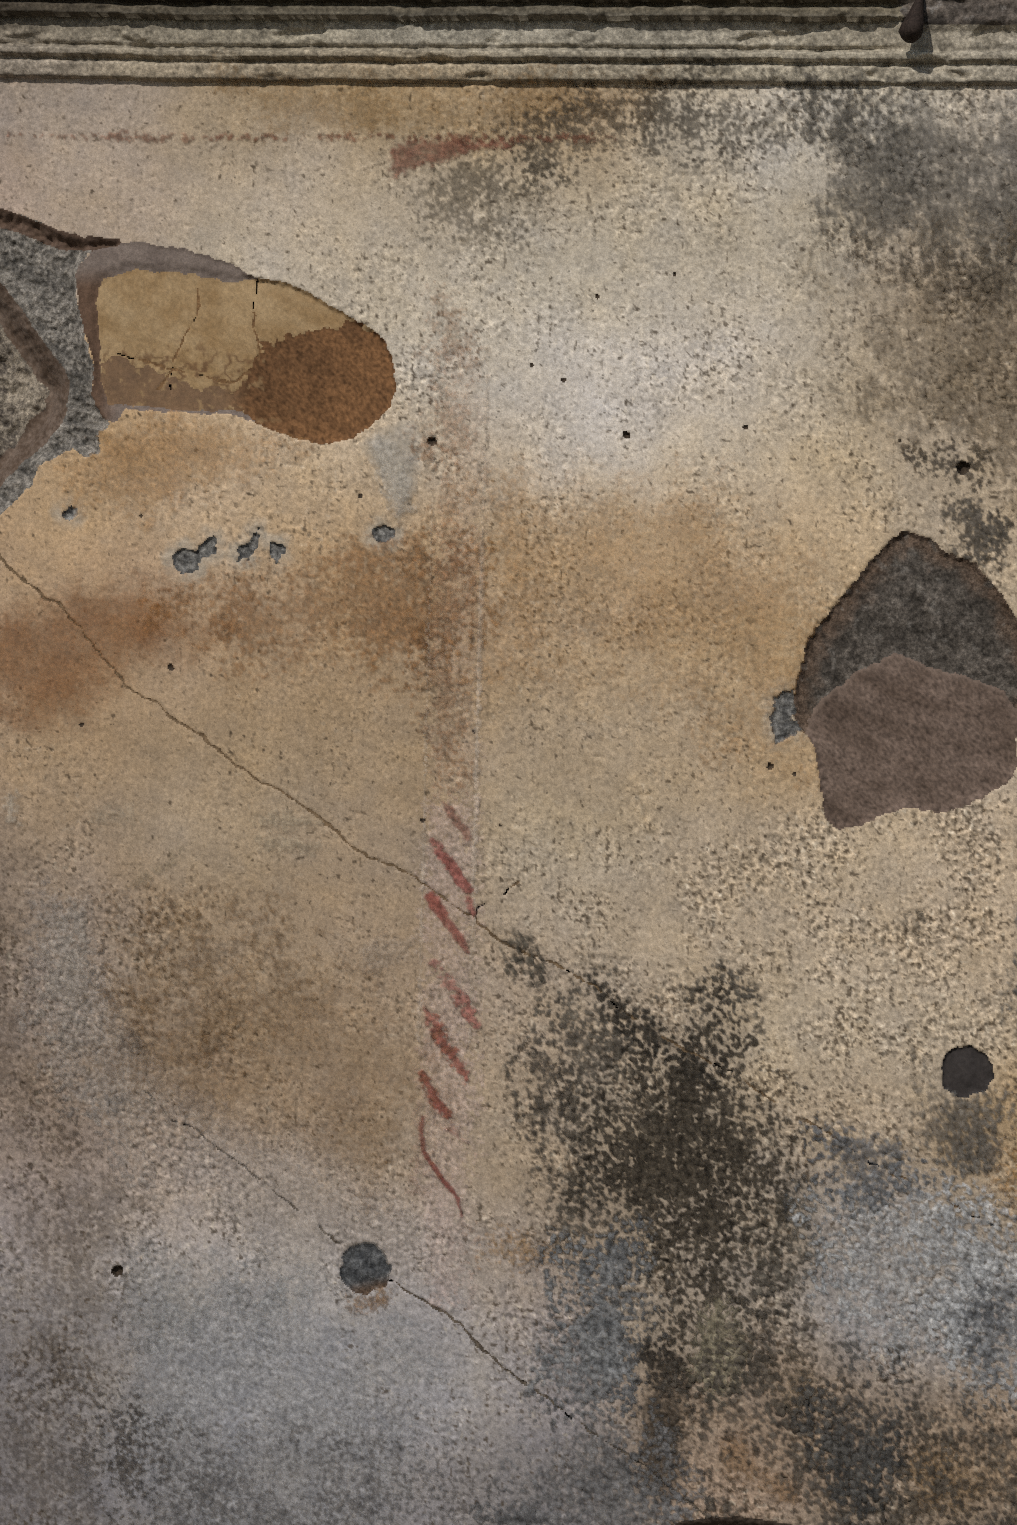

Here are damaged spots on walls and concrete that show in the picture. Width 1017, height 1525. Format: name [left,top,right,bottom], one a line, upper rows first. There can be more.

damp [814,75,1017,303]
flaking render [0,208,396,515]
flaking render [172,535,217,574]
flaking render [236,527,286,564]
flaking render [372,525,395,543]
damp [902,440,1014,570]
flaking render [769,531,1017,830]
crack [0,553,712,1064]
crack [196,1129,341,1244]
damp [470,929,1017,1525]
crack [745,1081,853,1151]
crack [396,1282,709,1519]